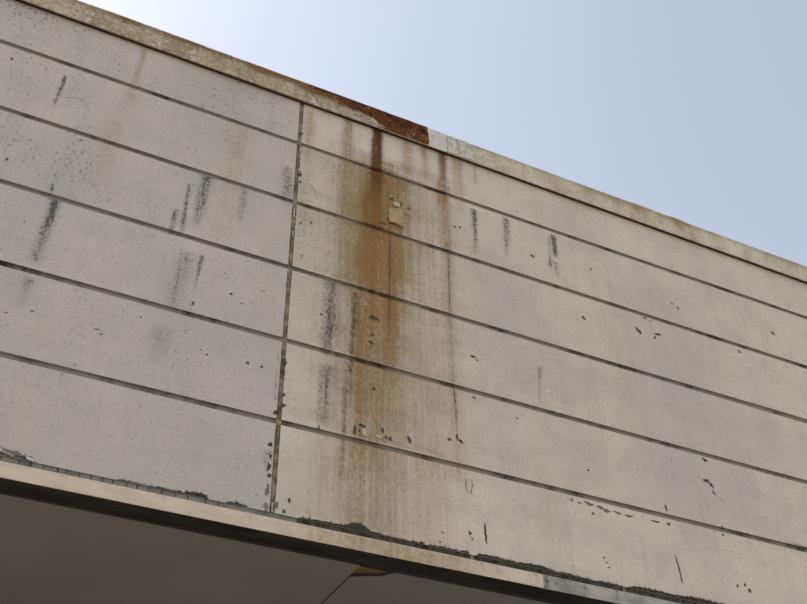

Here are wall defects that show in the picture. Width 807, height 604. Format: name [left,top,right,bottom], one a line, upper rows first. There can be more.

rust [111,12,206,47]
water stain [35,185,58,260]
rust [221,52,429,376]
peeling [353,424,392,442]
spalling [264,441,291,513]
spalling [297,517,723,604]